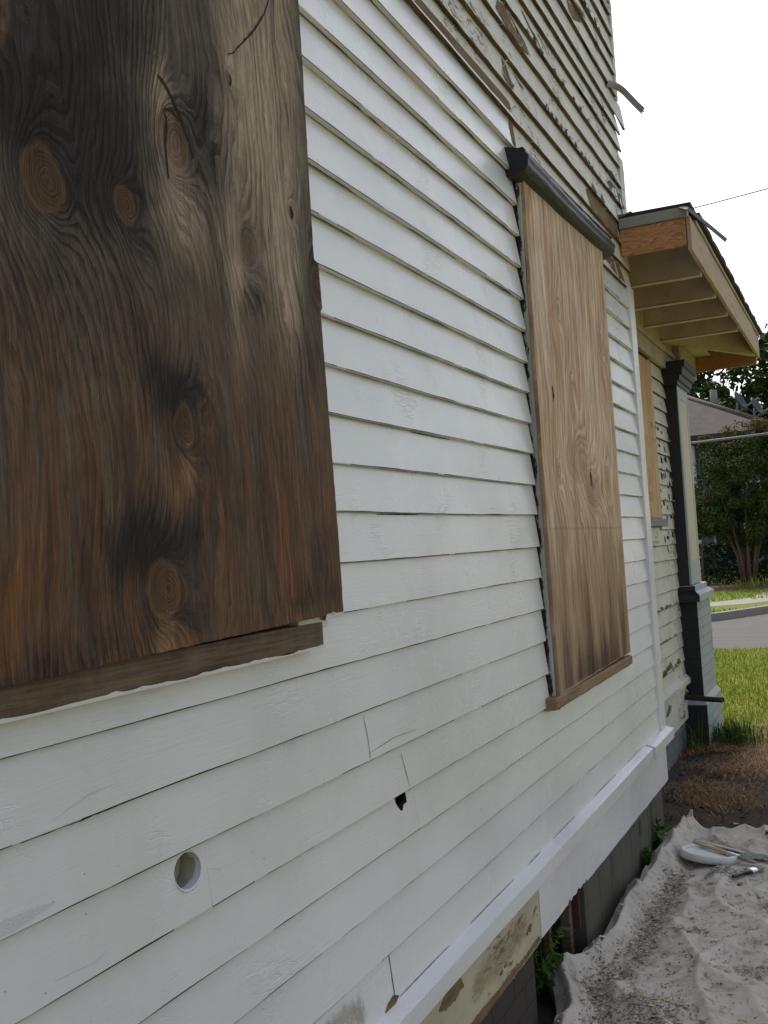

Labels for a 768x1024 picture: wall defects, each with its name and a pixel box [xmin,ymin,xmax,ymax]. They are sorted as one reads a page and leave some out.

peeling [413,0,516,147]
peeling [546,102,624,240]
peeling [655,425,676,543]
crack [363,716,415,782]
crack [389,946,449,1001]
peeling [439,977,465,1012]
peeling [472,906,541,1024]